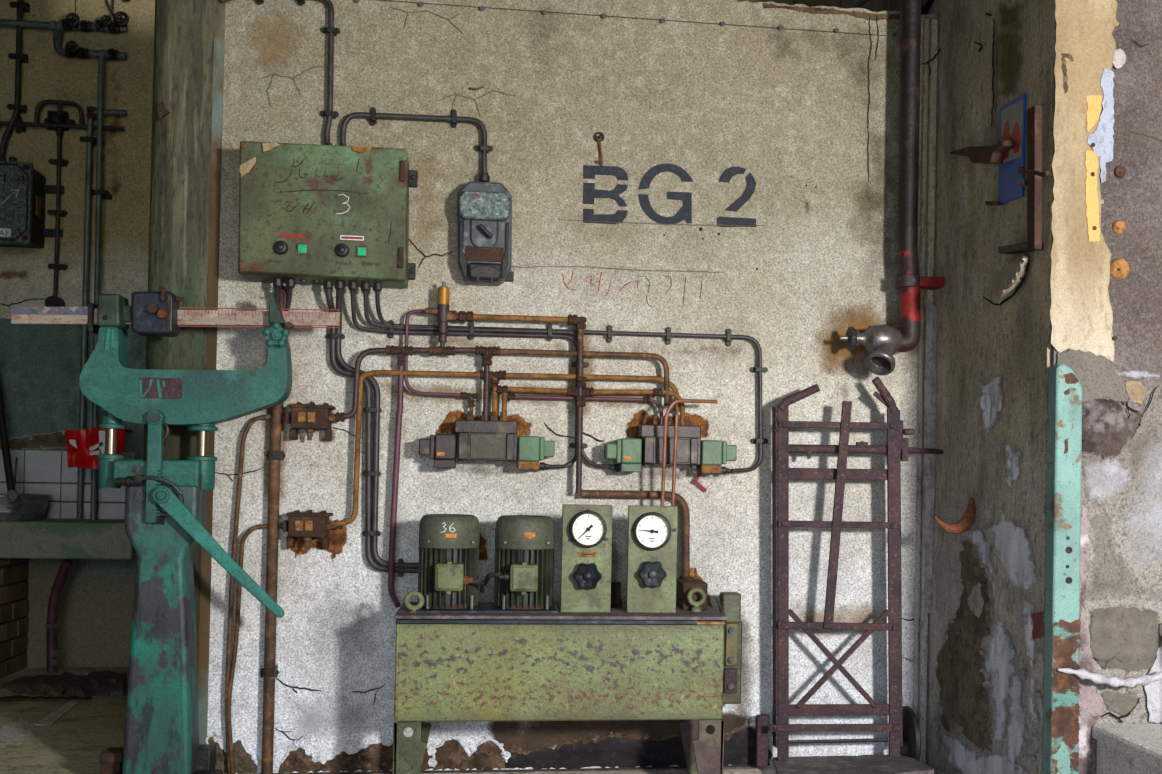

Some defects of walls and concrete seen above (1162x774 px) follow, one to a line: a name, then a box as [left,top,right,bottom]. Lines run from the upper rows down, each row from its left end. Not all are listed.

crack [257,66,328,108]
peeling [1050,0,1148,459]
corrosion [823,311,878,371]
flaking render [934,515,1044,774]
flaking render [1078,500,1105,774]
crack [0,693,93,701]
flaking render [205,732,260,774]
flaking render [278,740,393,773]
flaking render [422,731,686,771]
flaking render [724,725,773,765]